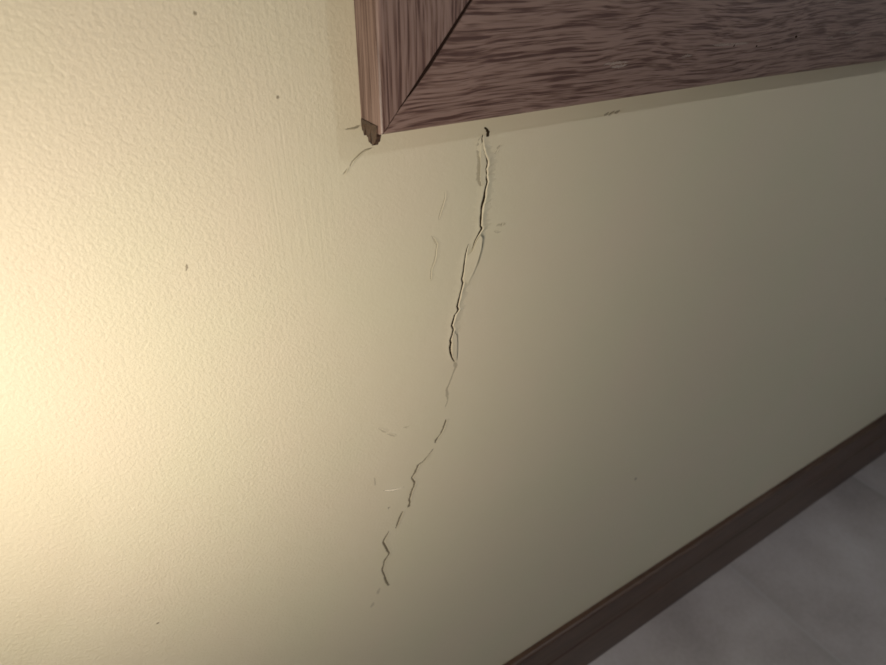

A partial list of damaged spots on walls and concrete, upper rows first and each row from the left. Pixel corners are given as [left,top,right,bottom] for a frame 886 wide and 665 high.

crack [442,127,498,363]
crack [381,418,450,585]